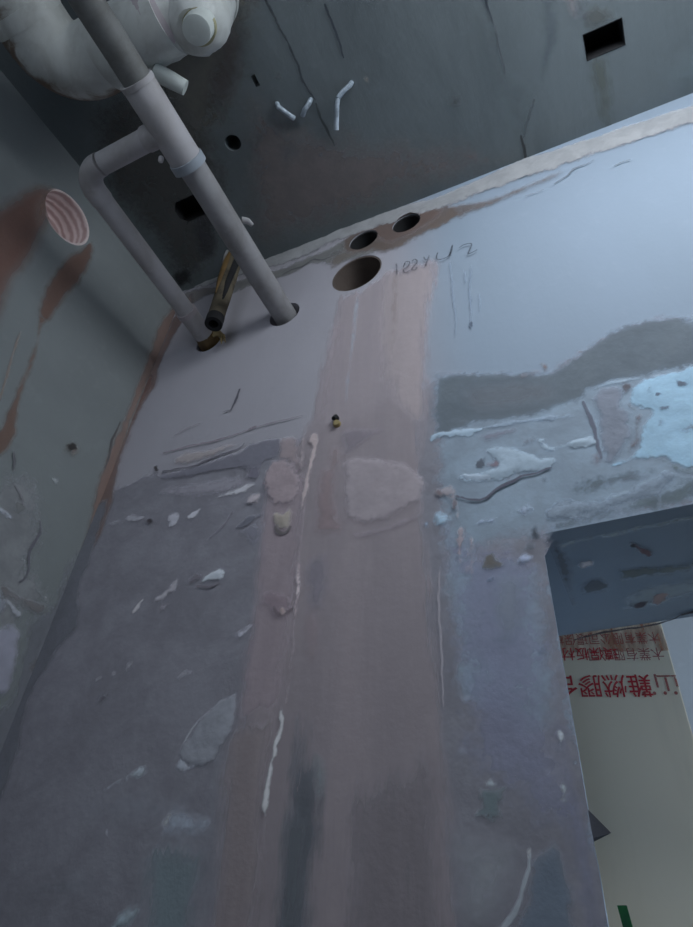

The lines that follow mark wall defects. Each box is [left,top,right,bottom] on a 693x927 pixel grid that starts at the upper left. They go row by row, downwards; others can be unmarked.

crack [265,0,335,146]
crack [324,4,344,58]
crack [520,99,535,158]
corrosion [0,188,51,306]
corrosion [39,243,92,328]
corrosion [0,354,35,454]
crack [456,467,552,501]
spalling [345,318,693,927]
spalling [0,438,306,927]